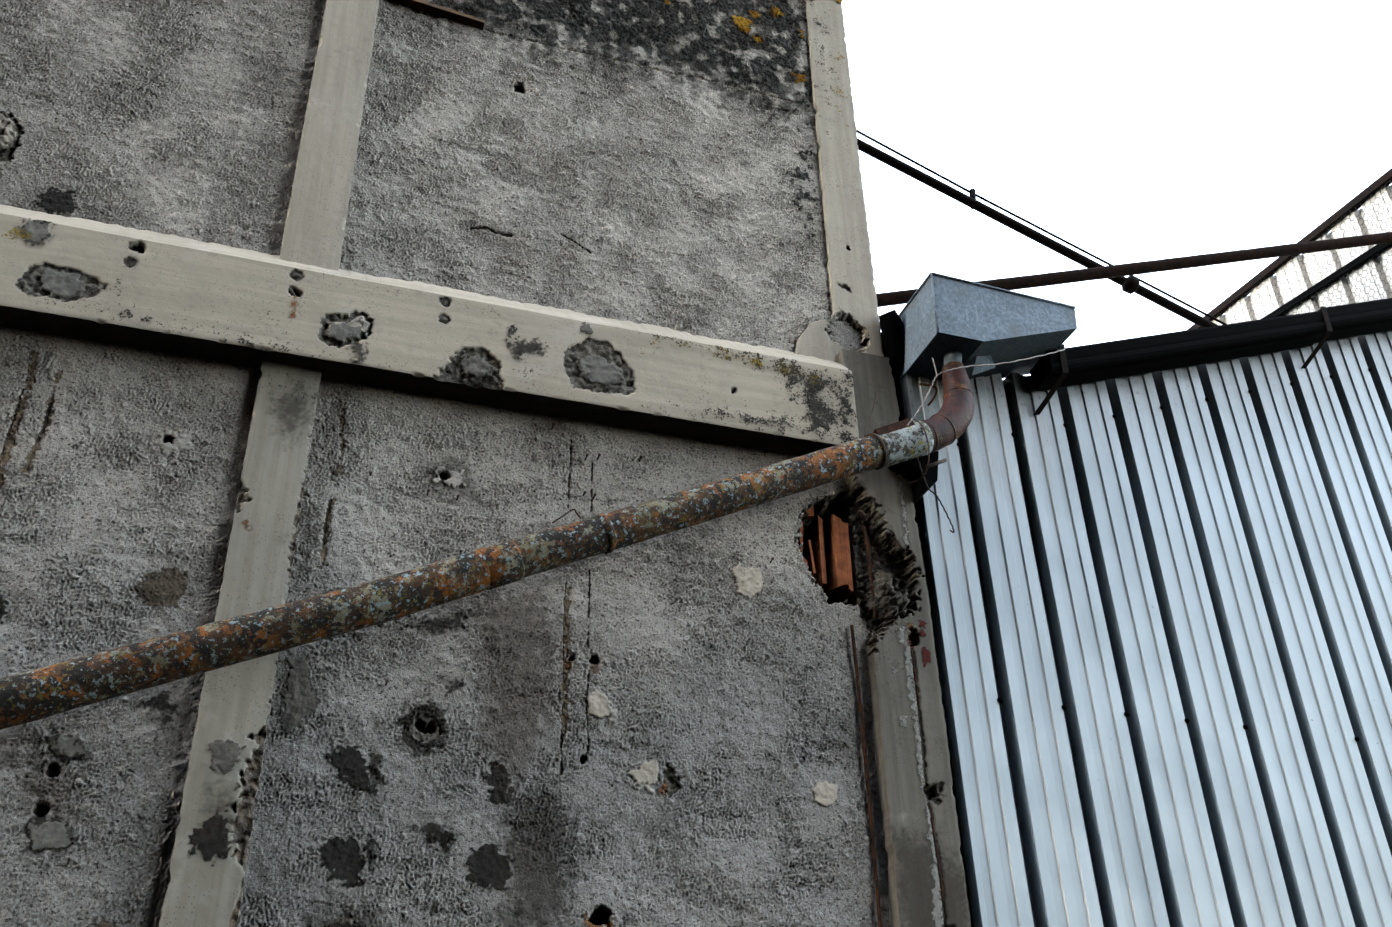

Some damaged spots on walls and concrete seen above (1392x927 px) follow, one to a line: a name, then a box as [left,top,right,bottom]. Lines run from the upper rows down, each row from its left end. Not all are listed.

flaking render [0,113,24,162]
water stain [432,0,837,252]
spalling [15,263,106,302]
spalling [318,312,373,364]
spalling [433,348,503,390]
spalling [798,489,915,657]